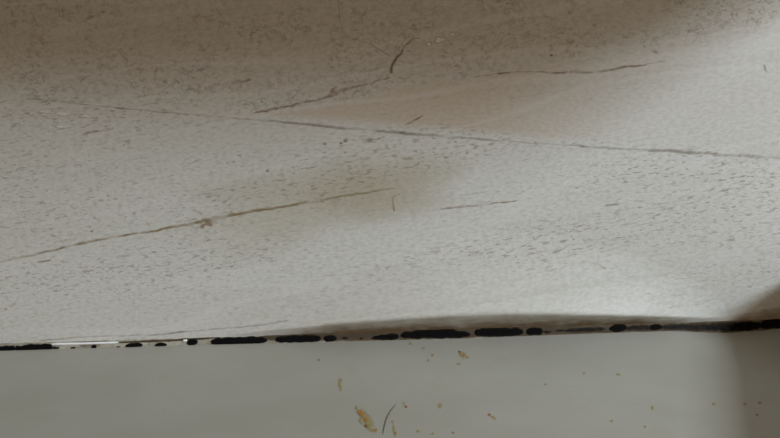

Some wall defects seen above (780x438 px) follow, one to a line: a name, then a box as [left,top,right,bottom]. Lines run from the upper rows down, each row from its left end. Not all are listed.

crack [327,191,375,199]
crack [230,203,300,216]
crack [123,226,172,236]
water stain [117,314,780,347]